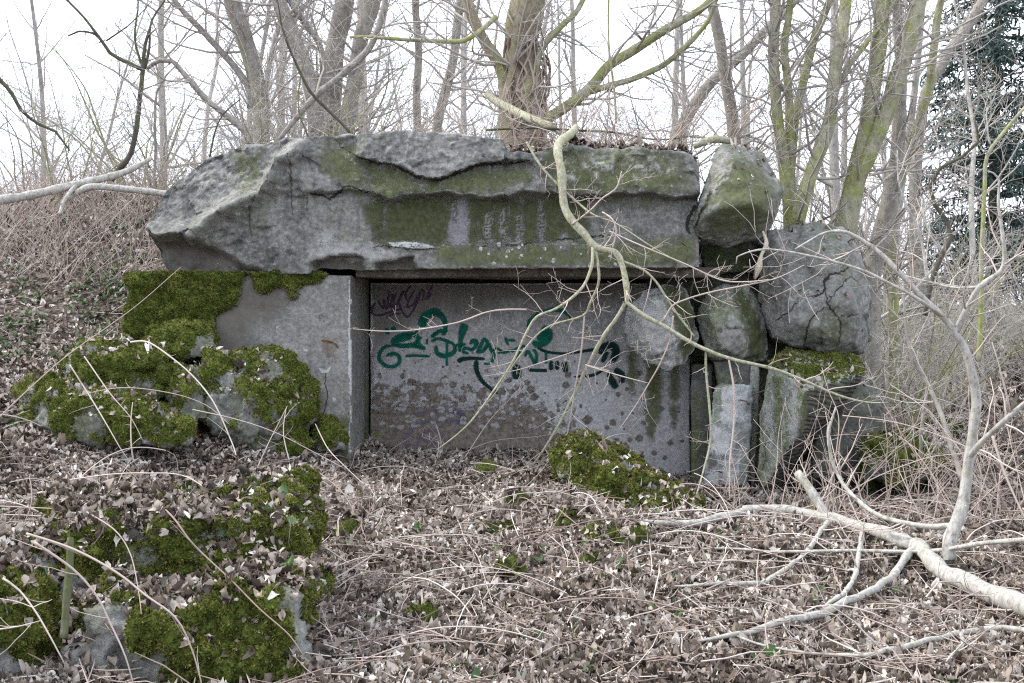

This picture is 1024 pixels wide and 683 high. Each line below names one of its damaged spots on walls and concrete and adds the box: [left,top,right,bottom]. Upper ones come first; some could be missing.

leakage [307,201,434,262]
leakage [448,199,589,265]
crack [775,267,860,349]
leakage [627,299,679,438]